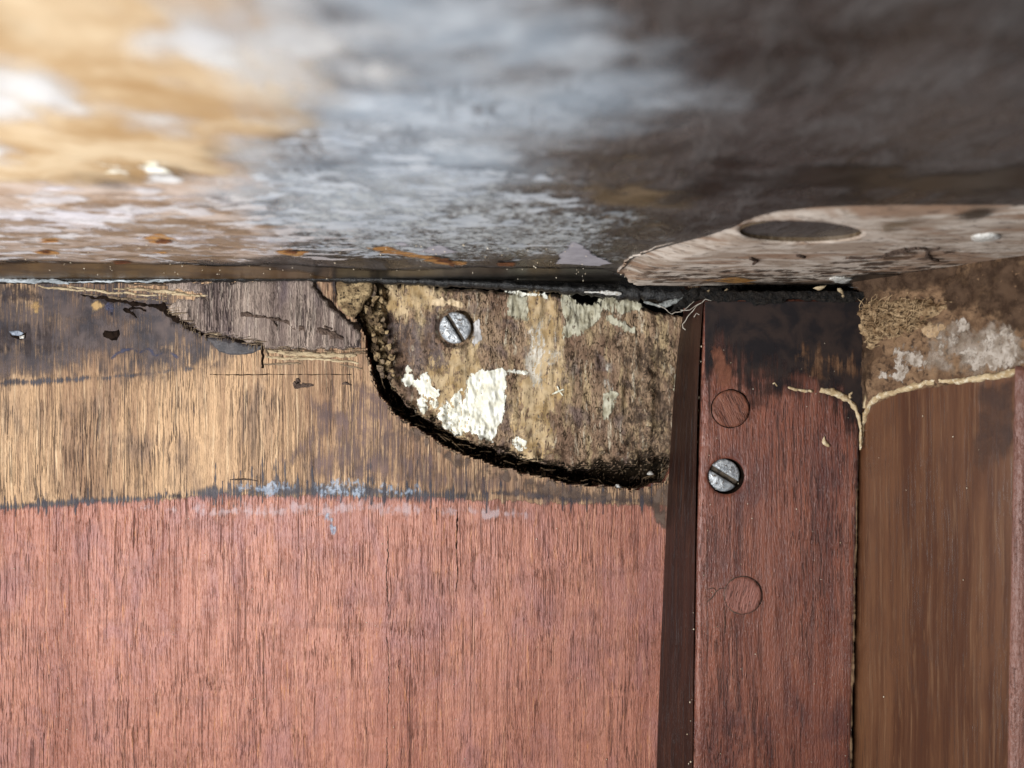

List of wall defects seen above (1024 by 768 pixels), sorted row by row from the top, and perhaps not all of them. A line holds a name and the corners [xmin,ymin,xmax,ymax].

damp [0,337,675,528]
peeling [0,125,1024,509]
damp [705,301,862,432]